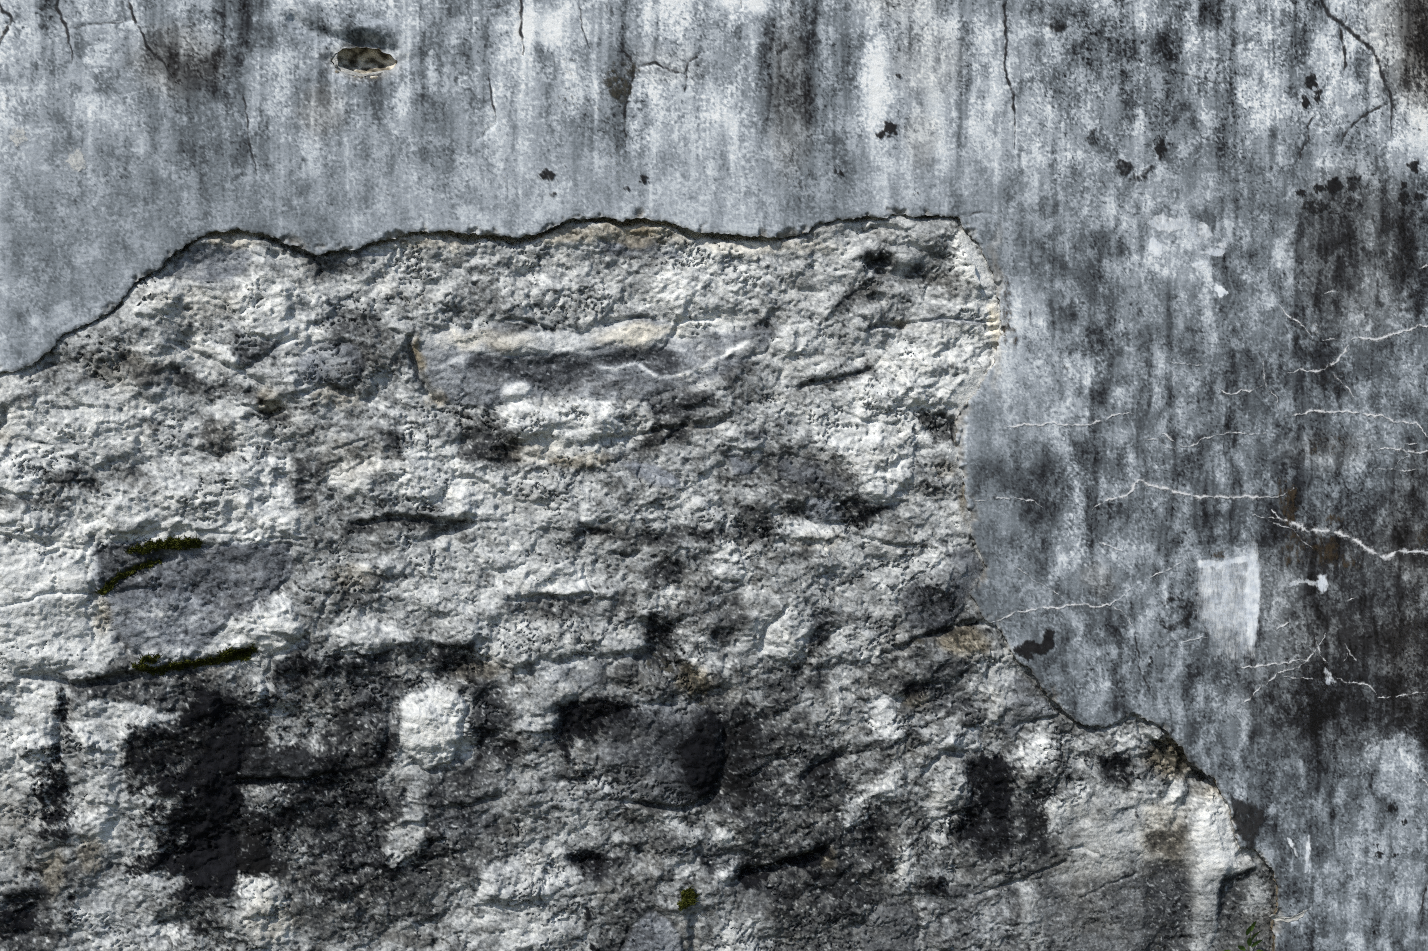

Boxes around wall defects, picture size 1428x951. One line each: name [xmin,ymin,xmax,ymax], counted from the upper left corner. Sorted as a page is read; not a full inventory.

crack [0,0,172,77]
spalling [331,47,398,79]
leakage [875,121,899,139]
crack [1002,1,1016,148]
mould [1302,70,1323,112]
crack [1297,0,1393,167]
leakage [1290,159,1428,320]
crack [1172,307,1428,471]
flaking render [0,214,1307,951]
crack [1095,479,1428,560]
leakage [1288,575,1355,612]
leakage [116,642,477,951]